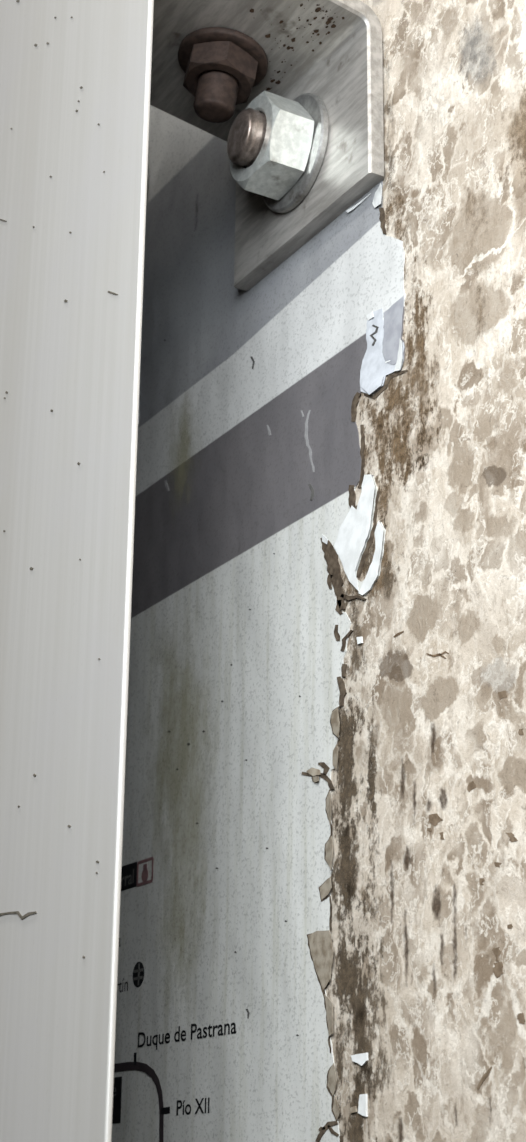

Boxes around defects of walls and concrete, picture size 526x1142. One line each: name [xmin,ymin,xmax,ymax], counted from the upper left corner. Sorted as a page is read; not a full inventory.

peeling [322,296,408,595]
peeling [330,706,341,770]
peeling [306,767,340,1121]